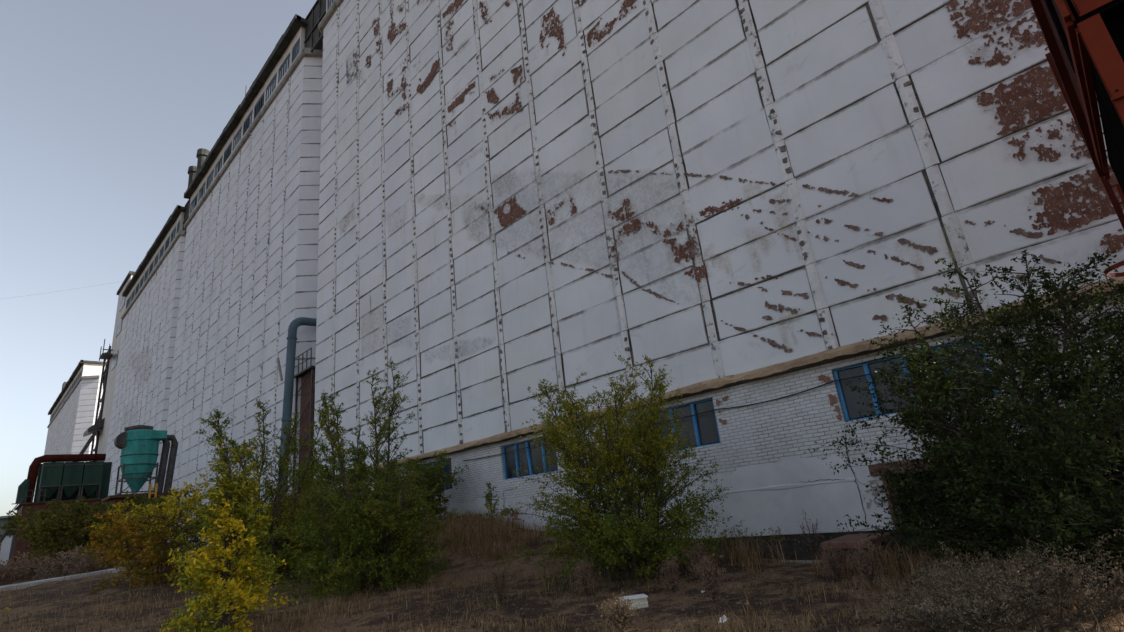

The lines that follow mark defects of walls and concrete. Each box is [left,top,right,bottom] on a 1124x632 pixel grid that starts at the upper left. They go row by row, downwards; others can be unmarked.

peeling [346,1,406,84]
peeling [539,7,567,56]
peeling [585,0,636,47]
peeling [946,0,1048,67]
peeling [387,58,438,115]
peeling [447,65,523,126]
peeling [964,66,1124,238]
peeling [475,195,526,227]
peeling [546,173,893,304]
peeling [843,238,938,271]
peeling [729,275,809,320]
peeling [825,276,926,308]